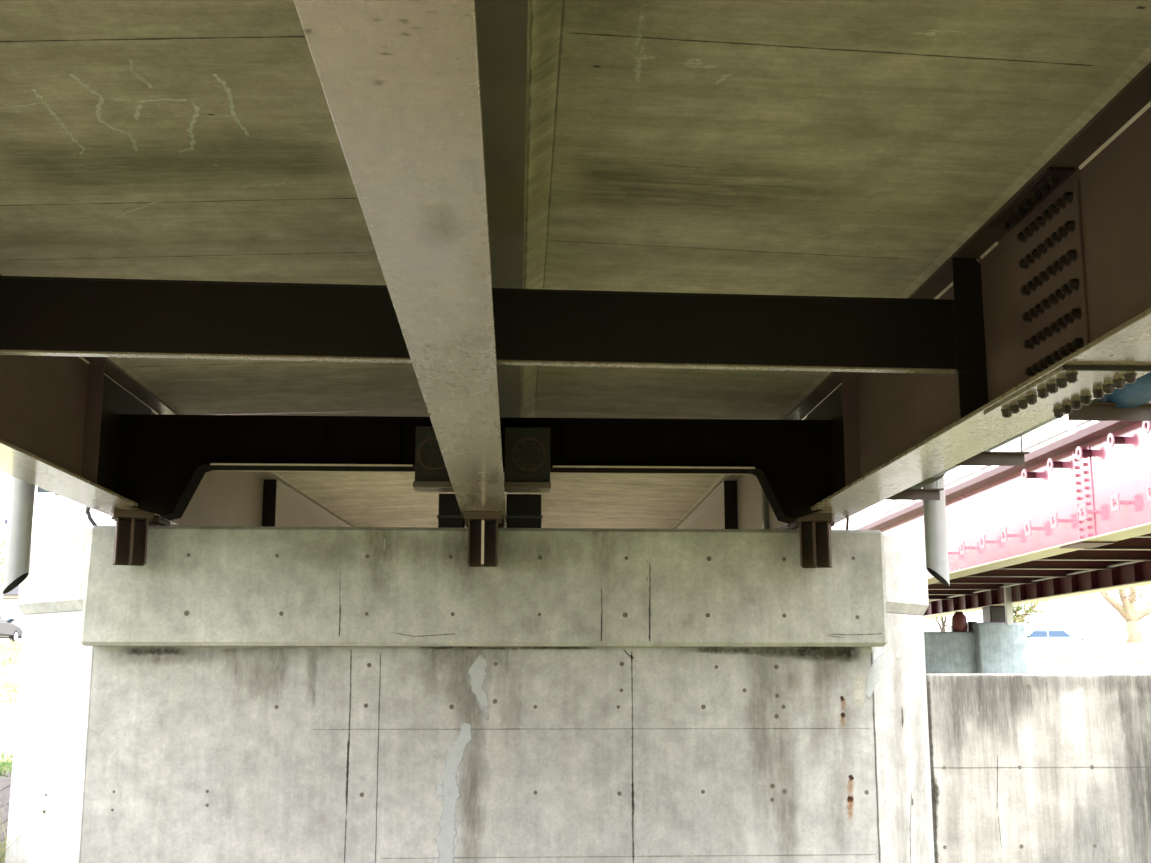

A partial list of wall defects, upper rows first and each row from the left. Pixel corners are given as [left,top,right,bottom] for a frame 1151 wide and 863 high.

crack [29,88,86,155]
crack [68,73,200,153]
crack [212,73,250,136]